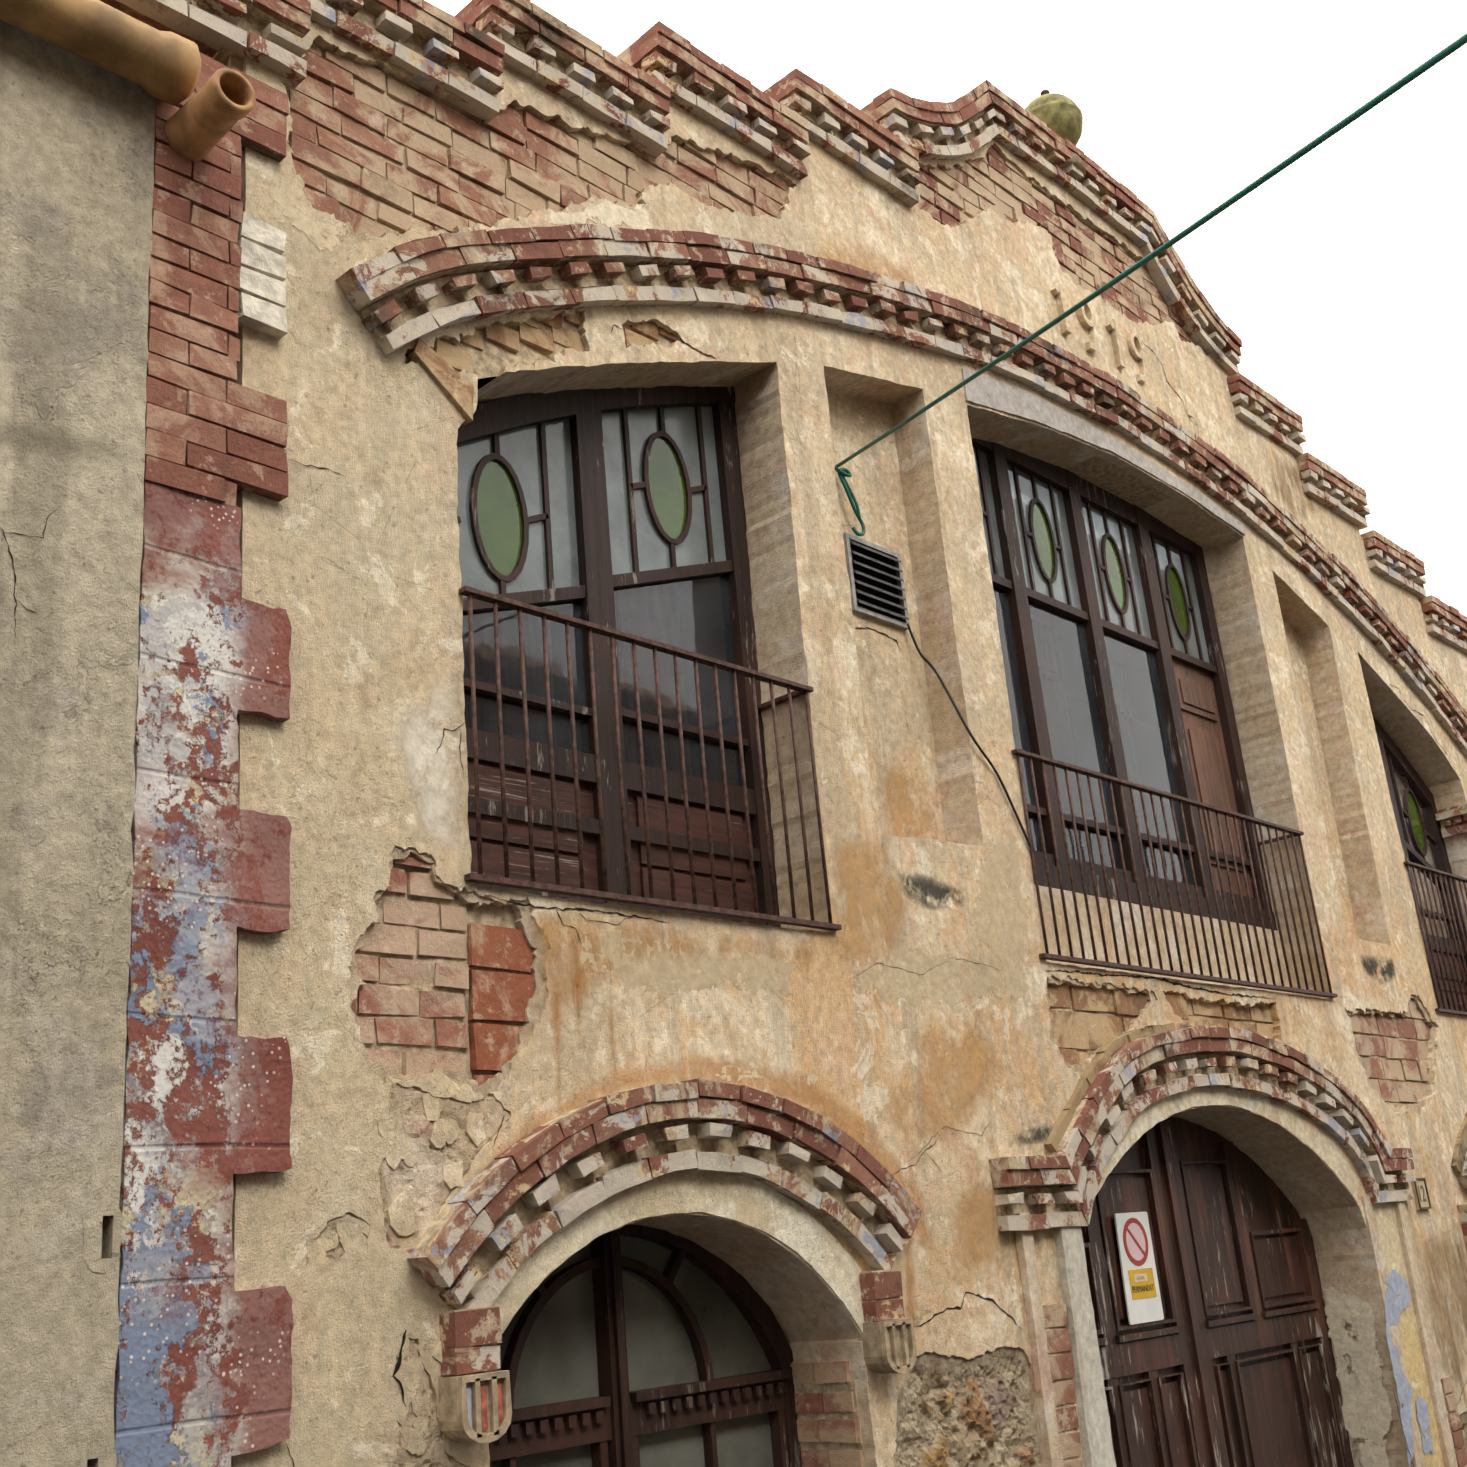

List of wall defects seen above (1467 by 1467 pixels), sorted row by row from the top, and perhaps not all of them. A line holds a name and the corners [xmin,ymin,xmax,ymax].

crack [0,509,57,643]
flaking render [315,846,549,1263]
flaking render [1044,976,1274,1075]
flaking render [1346,995,1437,1115]
crack [894,1114,997,1174]
spalling [385,1318,469,1467]
flaking render [788,1361,865,1467]
spalling [893,1346,1042,1467]
crack [916,1292,1023,1331]
flaking render [1042,1303,1083,1467]
peeling [1321,1269,1467,1467]